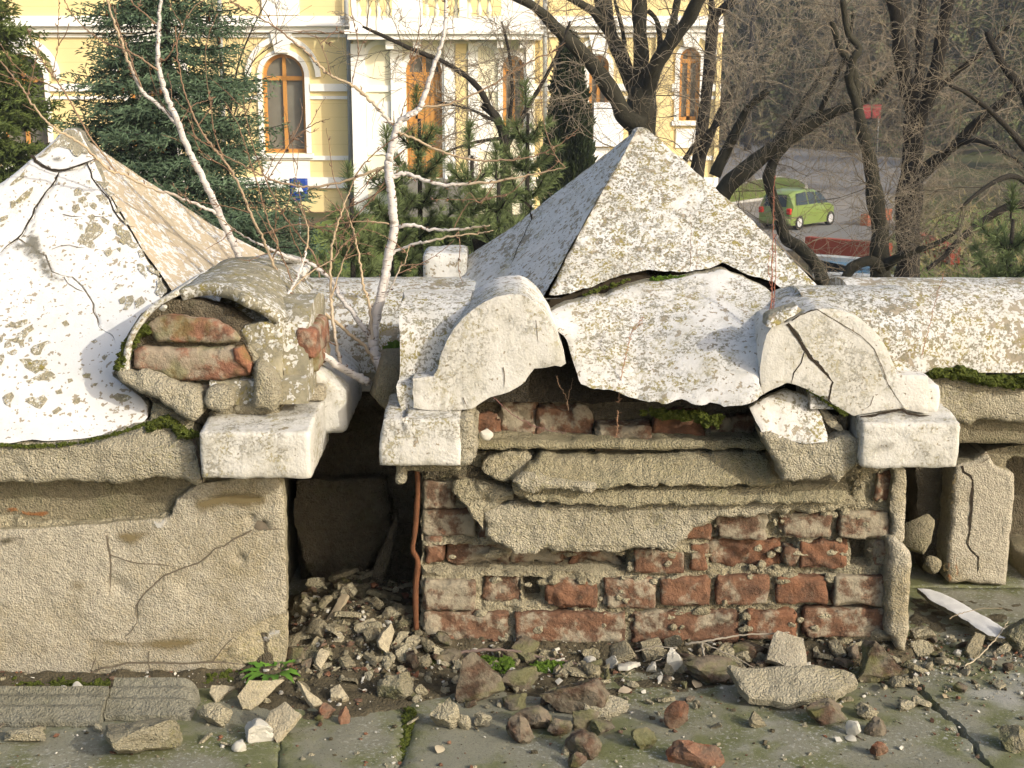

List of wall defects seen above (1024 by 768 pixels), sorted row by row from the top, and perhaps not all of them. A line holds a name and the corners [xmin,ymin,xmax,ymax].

crack [0,155,133,338]
peeling [0,319,98,414]
spalling [59,180,285,425]
spalling [296,314,331,372]
crack [786,308,930,418]
spalling [471,428,493,467]
crack [961,453,996,569]
crack [106,528,274,636]
spalling [215,463,890,692]
crack [91,636,243,673]